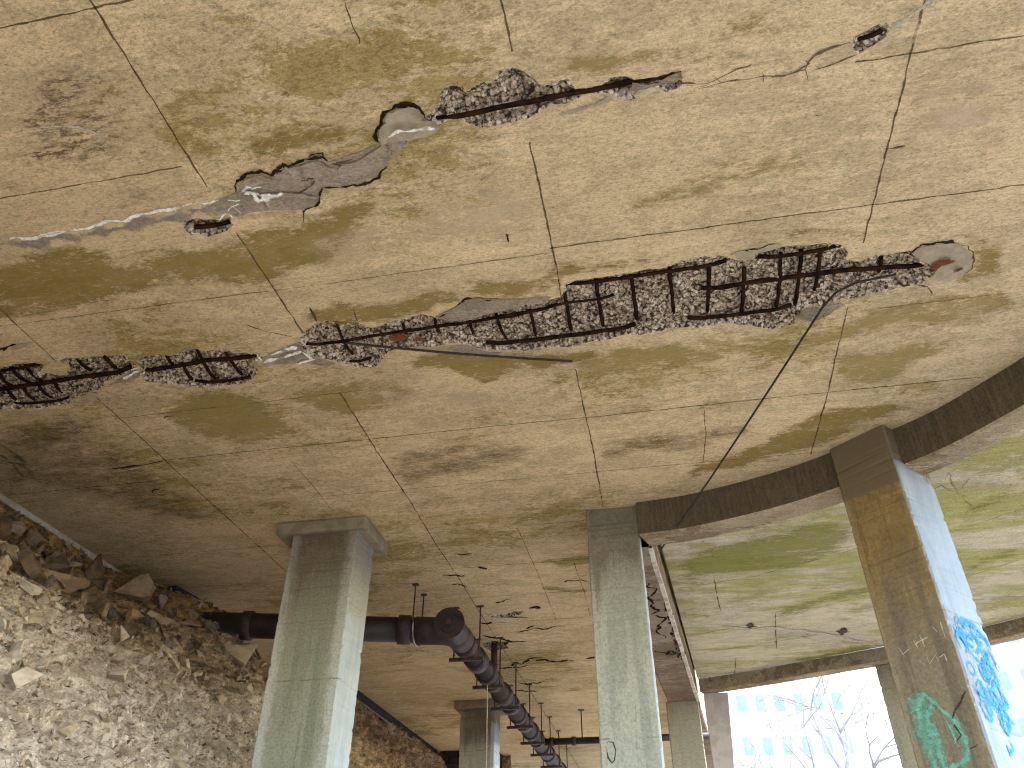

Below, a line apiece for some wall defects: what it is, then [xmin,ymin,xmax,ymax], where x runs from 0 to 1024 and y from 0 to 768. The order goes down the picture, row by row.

crack [628,42,857,89]
spalling [853,23,891,54]
spalling [385,67,682,128]
peeling [184,141,407,237]
leakage [0,202,376,318]
corrosion [930,259,963,273]
spalling [0,240,975,409]
leakage [167,394,300,443]
crack [646,583,686,671]